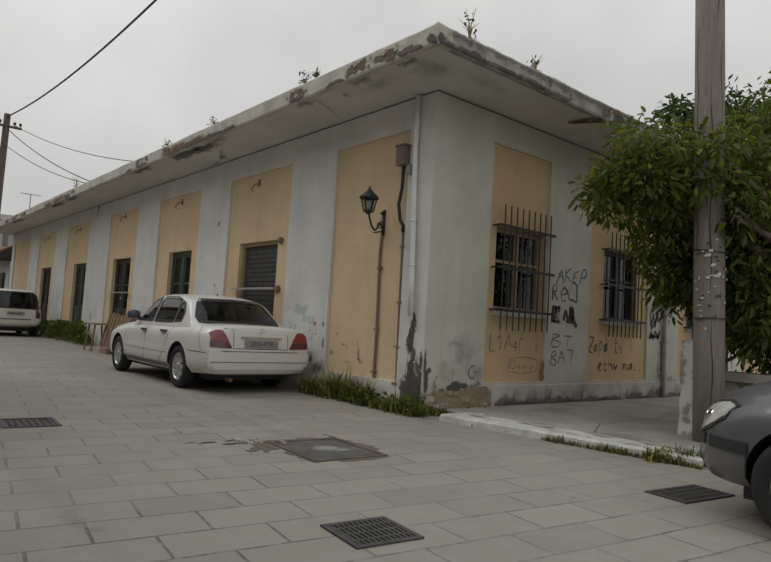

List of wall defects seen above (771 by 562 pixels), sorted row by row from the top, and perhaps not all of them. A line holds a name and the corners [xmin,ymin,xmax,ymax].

spalling [285,87,313,106]
spalling [326,32,571,102]
water stain [454,32,653,131]
spalling [161,124,235,162]